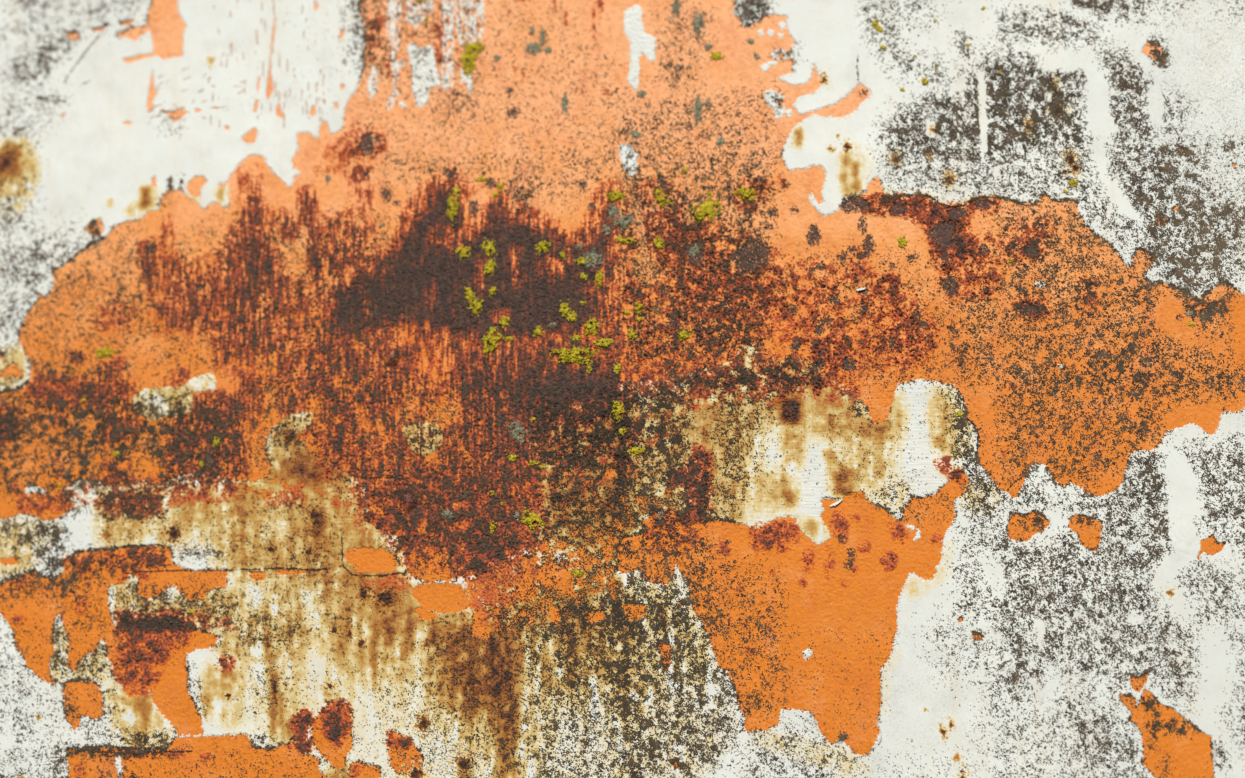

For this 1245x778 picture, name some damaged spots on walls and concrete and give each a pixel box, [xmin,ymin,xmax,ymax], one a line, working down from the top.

peeling [0,0,1245,526]
rust [821,120,1055,325]
rust [0,120,941,778]
rust [932,455,965,486]
peeling [0,546,423,778]
peeling [343,474,969,756]
peeling [1069,514,1102,552]
rust [1160,580,1183,604]
peeling [1198,535,1225,560]
leakage [877,749,951,778]
rust [917,703,974,778]
peeling [1119,674,1216,778]